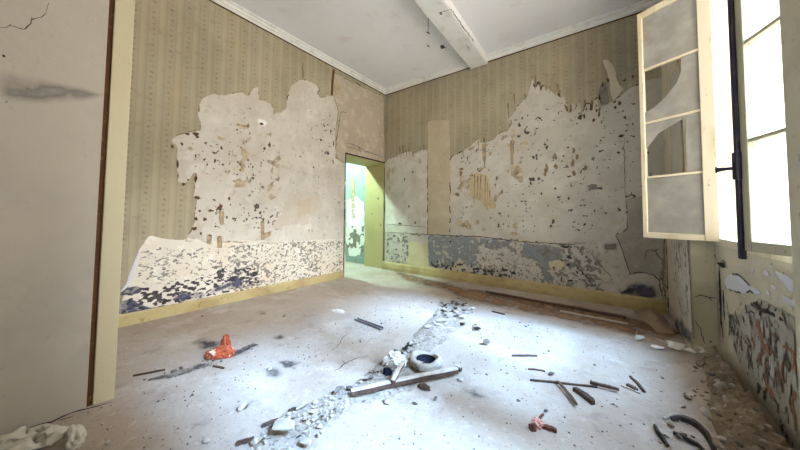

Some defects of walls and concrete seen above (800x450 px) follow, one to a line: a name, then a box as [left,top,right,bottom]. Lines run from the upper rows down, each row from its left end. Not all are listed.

water stain [7,85,92,99]
flaking render [235,119,267,135]
peeling [577,78,628,143]
flaking render [459,158,503,228]
crack [388,136,668,300]
flaking render [529,142,604,185]
peeling [670,60,693,334]
peeling [120,196,365,314]
peeling [380,220,630,294]
water stain [621,284,656,298]
flaking render [714,254,800,450]